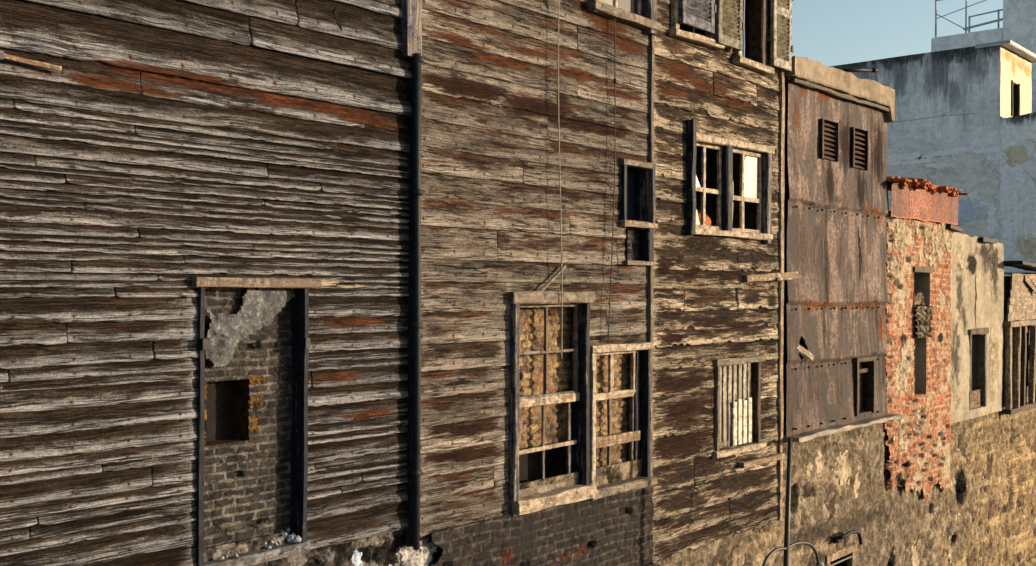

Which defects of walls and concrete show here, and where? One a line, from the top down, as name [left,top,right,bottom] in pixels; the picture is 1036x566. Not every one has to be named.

leakage [834,45,1000,73]
flaking render [886,137,1036,298]
spalling [205,288,295,367]
peeling [899,333,912,393]
peeling [893,408,928,486]
peeling [389,537,437,566]